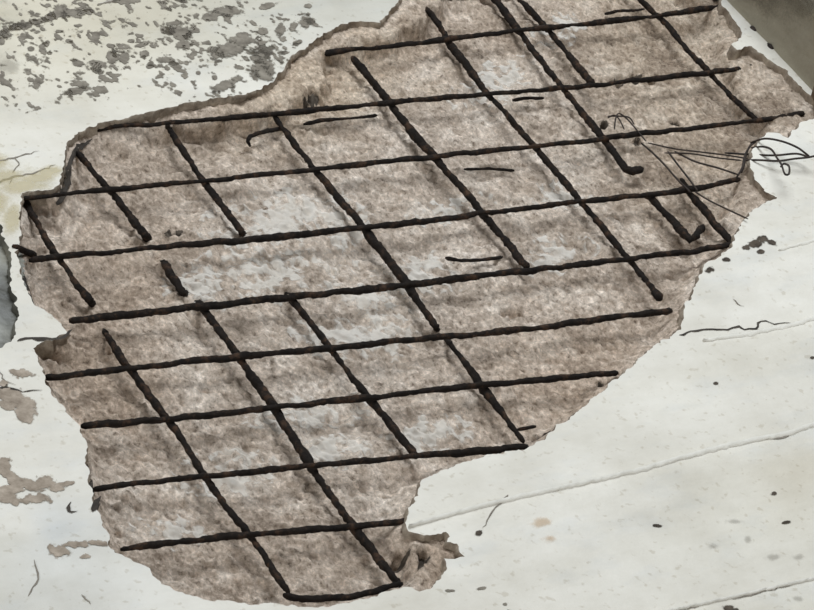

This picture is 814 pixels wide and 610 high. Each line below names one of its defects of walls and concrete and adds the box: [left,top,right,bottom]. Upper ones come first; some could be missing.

peeling [0,71,41,113]
spalling [12,0,814,492]
crack [680,300,789,335]
crack [0,372,33,392]
peeling [0,457,75,506]
spalling [218,468,347,532]
spalling [307,468,357,523]
spalling [318,455,485,523]
peeling [47,540,108,558]
spalling [93,479,378,608]
spalling [120,518,456,595]
spalling [283,581,403,603]